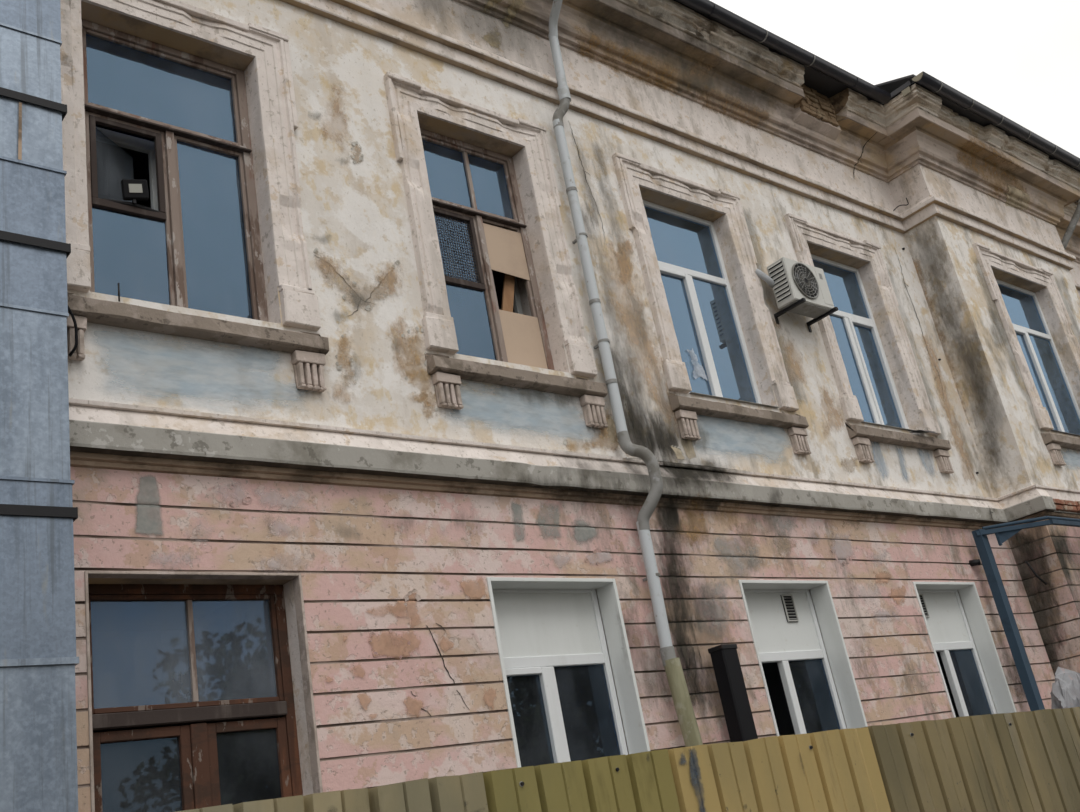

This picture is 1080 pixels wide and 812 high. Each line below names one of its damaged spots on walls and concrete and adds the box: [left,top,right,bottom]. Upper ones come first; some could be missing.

peeling [365,260,400,311]
water stain [616,241,657,400]
water stain [615,371,719,484]
water stain [924,332,974,479]
peeling [369,589,421,659]
crack [426,623,469,709]
water stain [658,499,705,704]
water stain [1015,533,1060,676]
water stain [1056,537,1070,578]